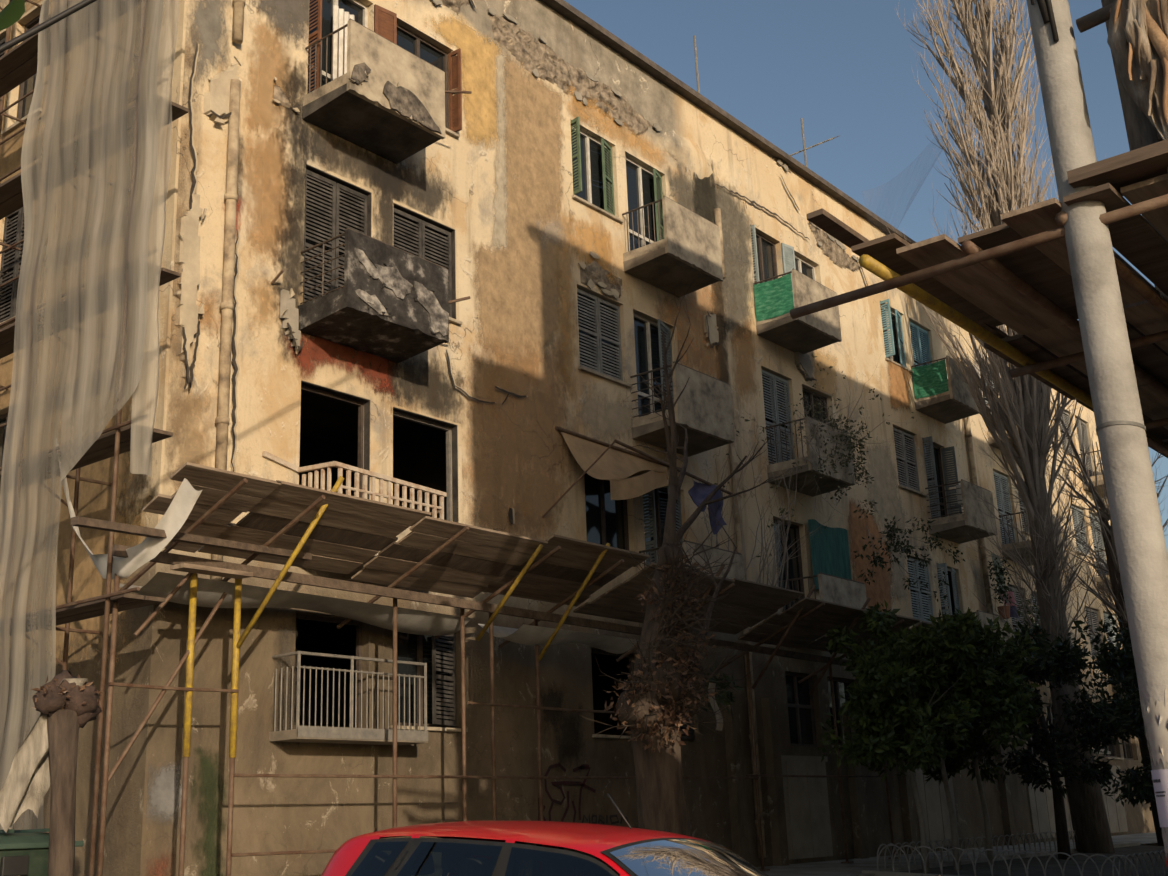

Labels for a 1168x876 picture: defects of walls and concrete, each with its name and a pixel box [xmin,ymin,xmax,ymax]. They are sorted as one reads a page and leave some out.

spalling [432,0,471,16]
crack [188,43,199,211]
spalling [349,62,371,86]
spalling [382,81,442,134]
spalling [488,7,662,248]
peeling [173,191,207,389]
flaking render [279,288,393,392]
spalling [354,248,451,337]
spalling [578,252,622,298]
flaking render [849,501,892,612]